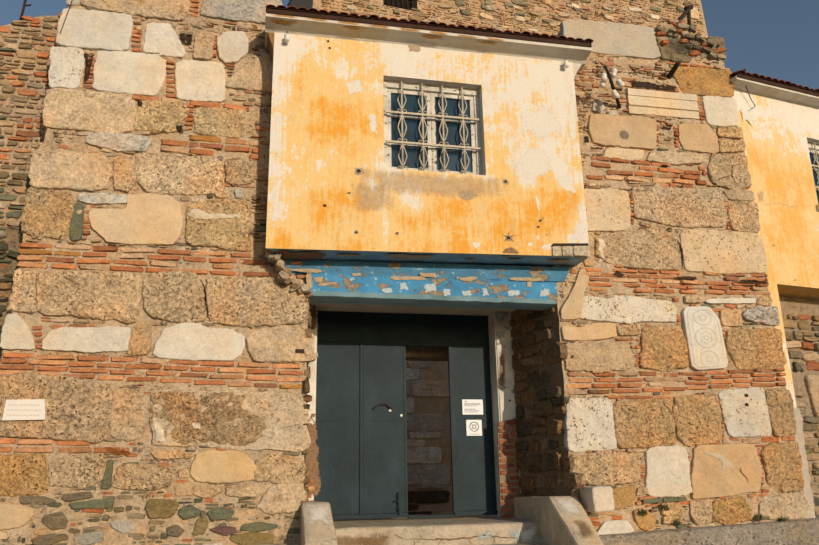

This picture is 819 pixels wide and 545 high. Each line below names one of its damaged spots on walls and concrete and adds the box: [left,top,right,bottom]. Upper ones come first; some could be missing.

peeling [517,94,589,184]
peeling [557,175,576,193]
flaking render [528,196,606,264]
flaking render [502,235,521,261]
flaking render [263,246,338,329]
peeling [382,272,451,296]
peeling [456,276,478,296]
peeling [508,277,550,297]
flaking render [305,409,330,524]
crack [395,534,537,545]